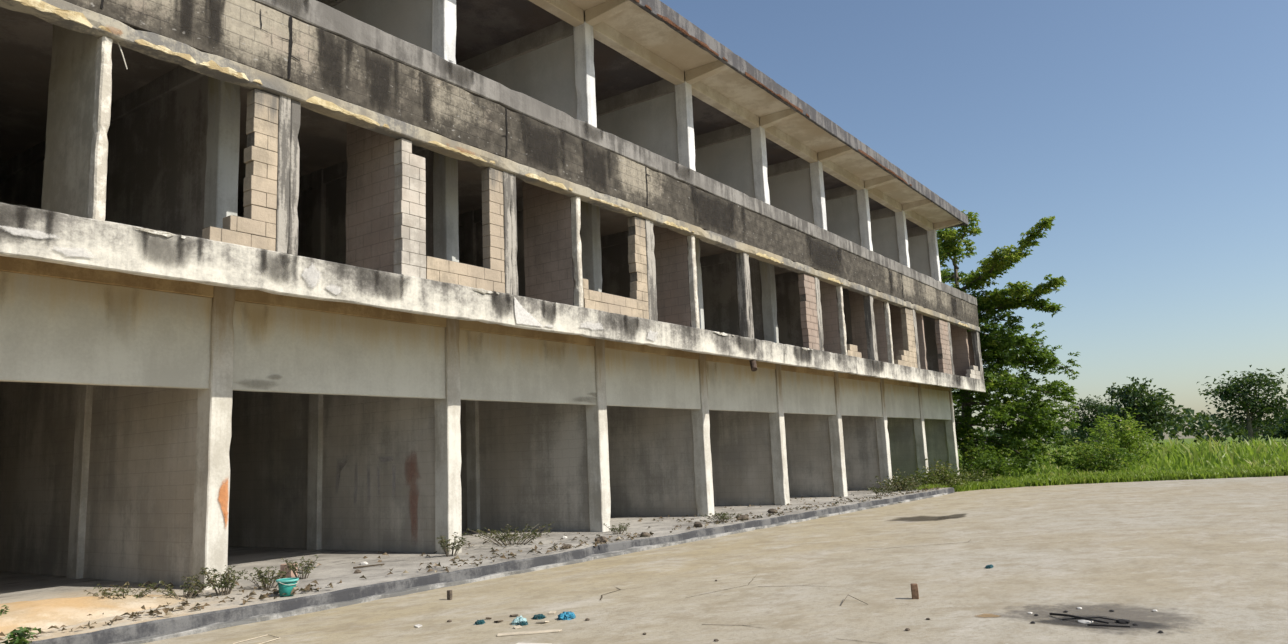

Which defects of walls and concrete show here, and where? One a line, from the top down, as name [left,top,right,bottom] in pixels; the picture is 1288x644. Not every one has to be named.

spalling [135,39,263,85]
damp [318,28,398,106]
spalling [14,0,113,221]
damp [420,70,431,121]
damp [582,121,611,188]
damp [0,205,27,231]
damp [676,162,745,232]
damp [143,227,202,260]
damp [262,249,297,278]
damp [376,270,406,296]
damp [808,235,841,271]
corrosion [218,480,229,526]